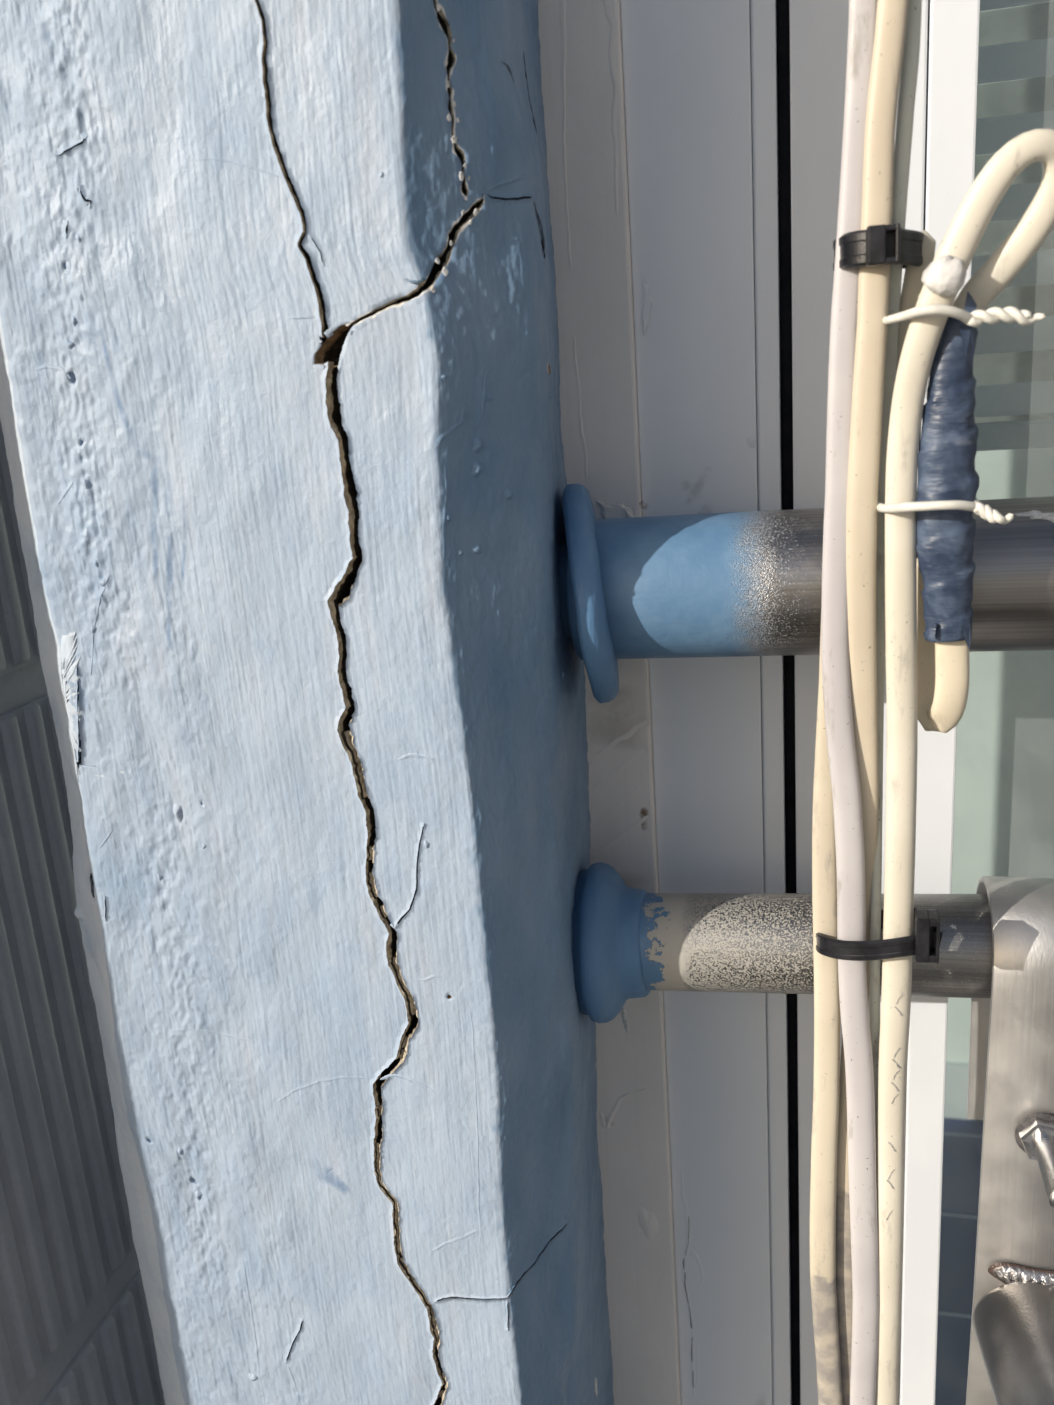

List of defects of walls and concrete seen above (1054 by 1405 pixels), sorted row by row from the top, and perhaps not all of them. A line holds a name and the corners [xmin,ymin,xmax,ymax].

crack [193,0,569,1405]